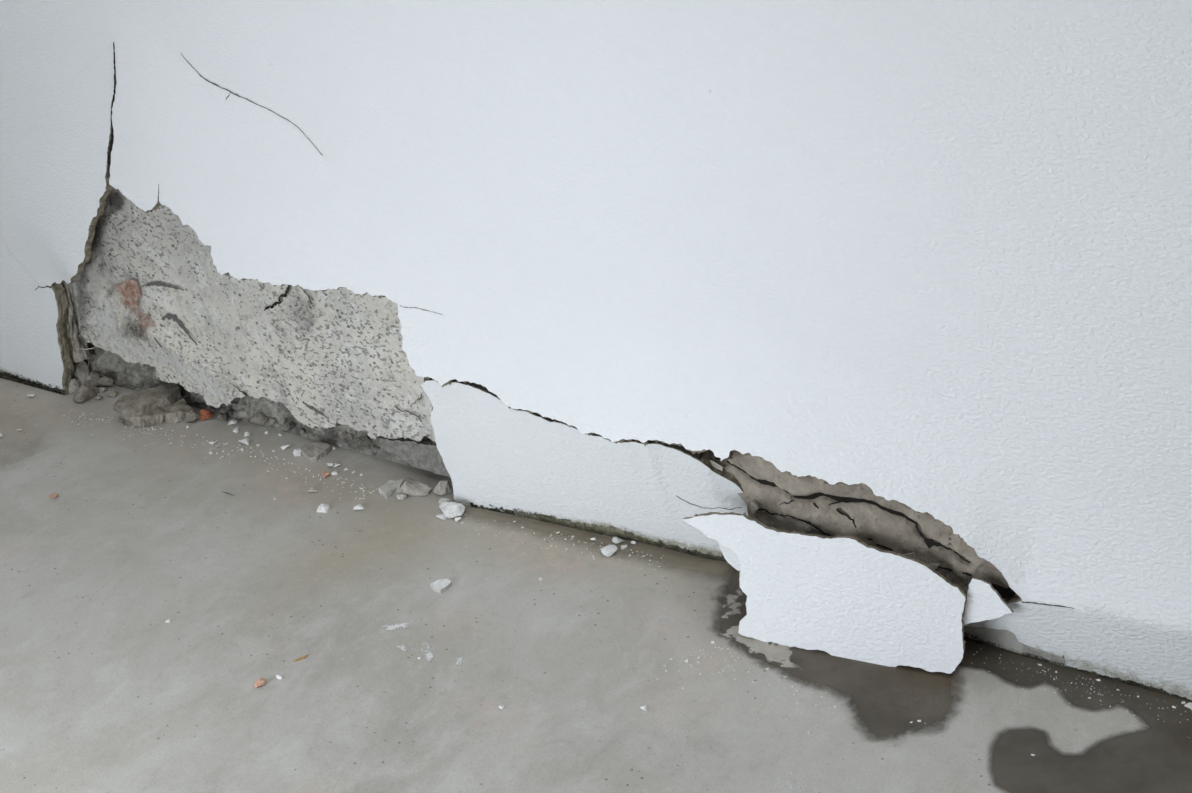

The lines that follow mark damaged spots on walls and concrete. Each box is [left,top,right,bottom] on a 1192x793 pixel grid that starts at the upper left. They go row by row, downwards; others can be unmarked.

crack [107,42,116,174]
crack [181,53,322,155]
spalling [45,187,451,478]
spalling [601,536,624,557]
spalling [707,450,1018,612]
water stain [463,502,1192,793]
peeling [963,626,1066,666]